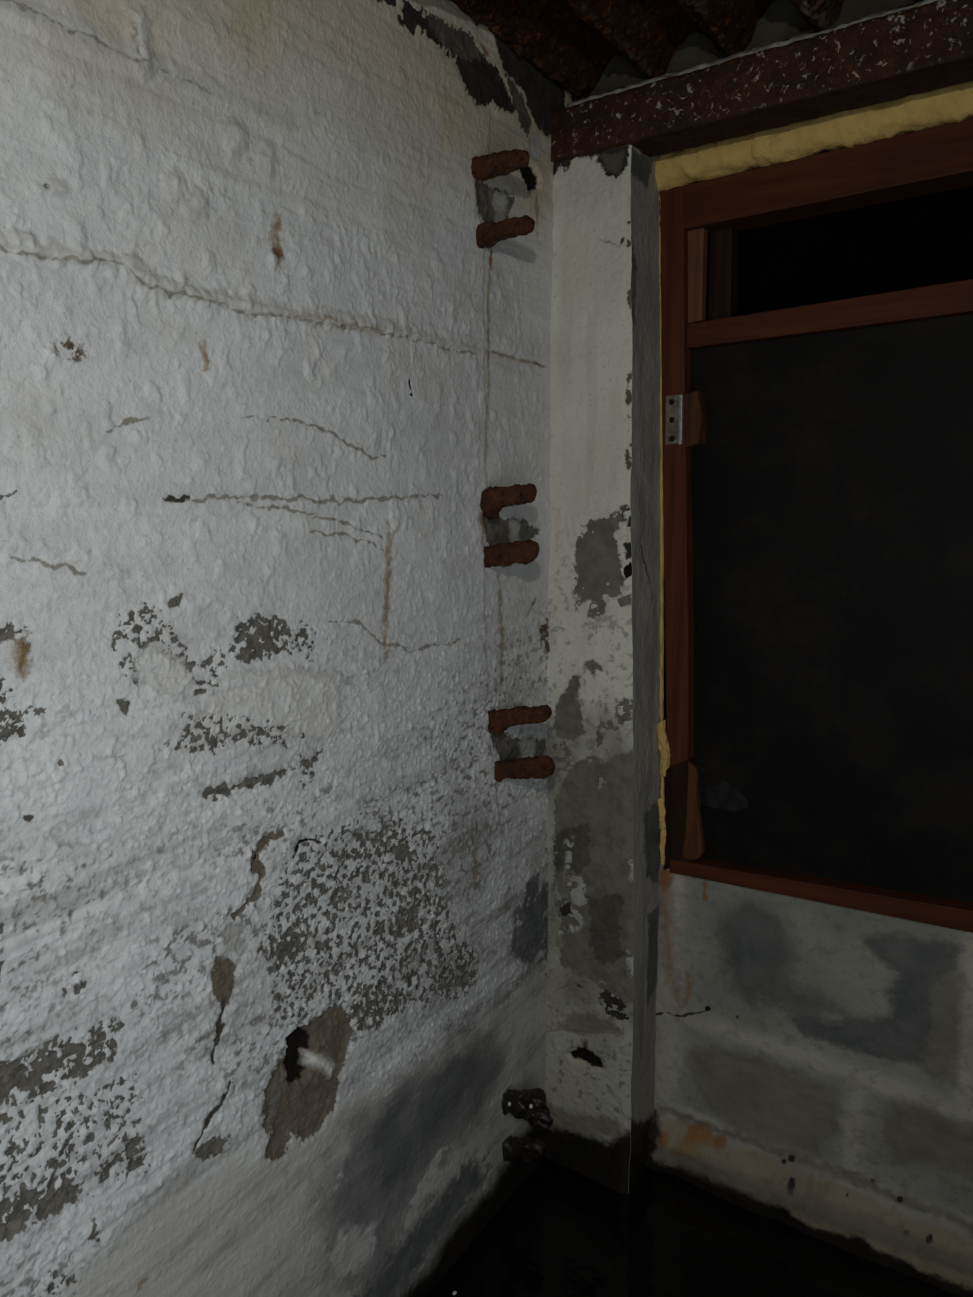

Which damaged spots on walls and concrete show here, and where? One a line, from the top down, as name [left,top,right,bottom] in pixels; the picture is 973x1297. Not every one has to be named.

peeling [573,504,632,618]
peeling [487,659,634,1020]
damp [643,803,660,883]
peeling [257,812,479,1162]
damp [508,872,549,966]
spalling [552,1030,603,1068]
damp [646,907,659,1007]
damp [788,931,969,1066]
damp [299,995,973,1297]